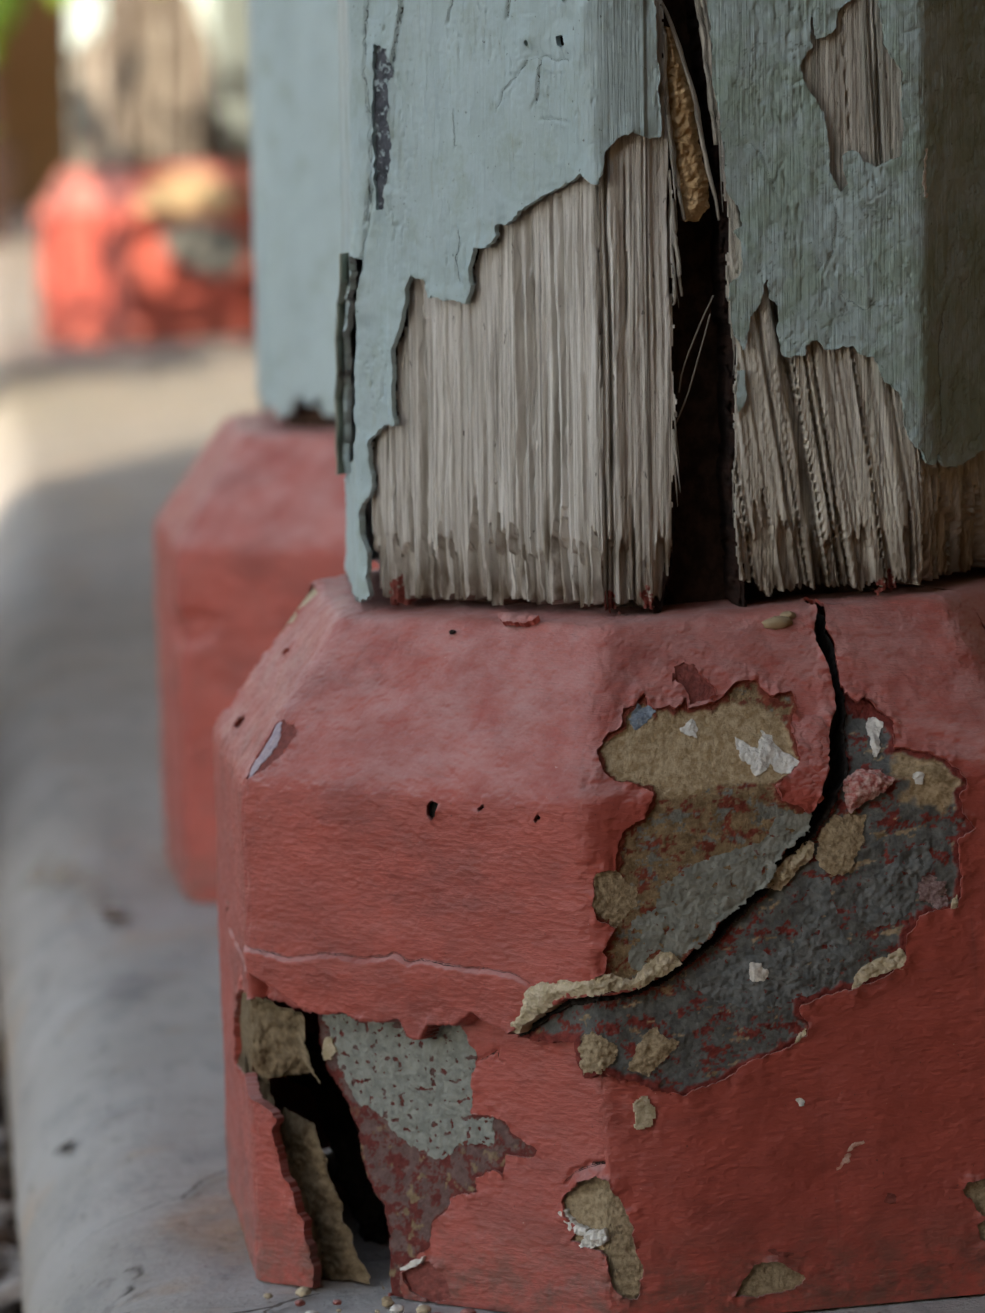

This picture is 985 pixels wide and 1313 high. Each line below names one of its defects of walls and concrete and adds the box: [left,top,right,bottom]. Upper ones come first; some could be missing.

peeling [334,253,351,475]
peeling [395,277,414,416]
peeling [248,721,297,778]
crack [224,895,531,984]
crack [482,614,849,1062]
spalling [510,661,975,1130]
peeling [237,983,537,1302]
peeling [558,1177,644,1299]